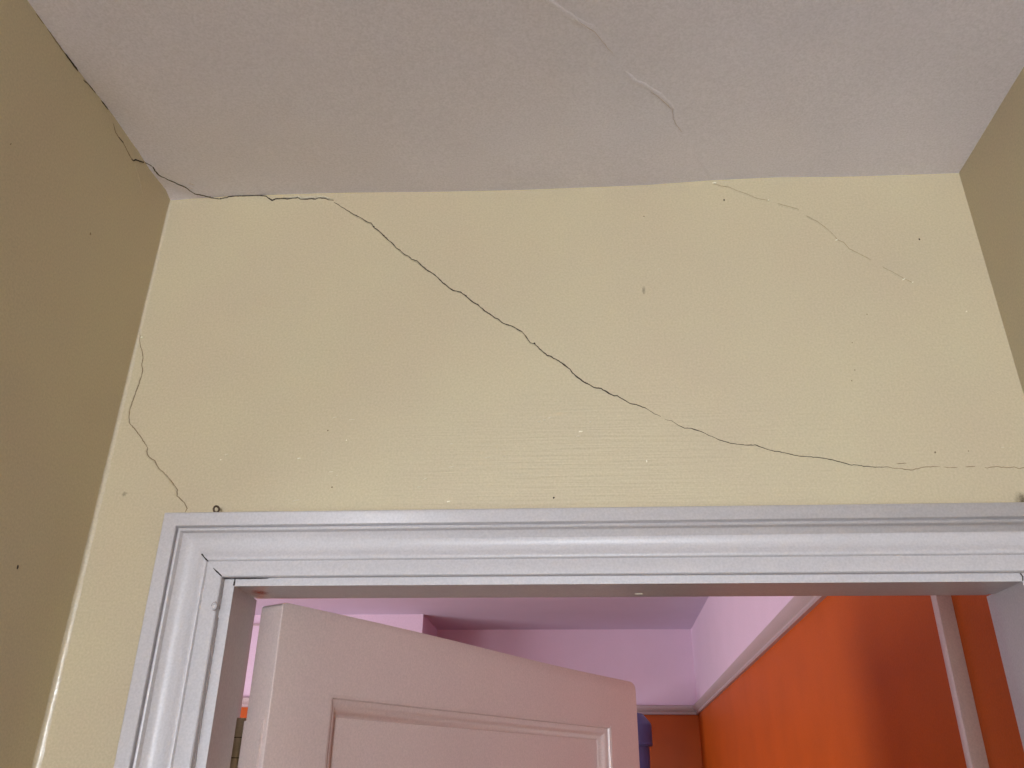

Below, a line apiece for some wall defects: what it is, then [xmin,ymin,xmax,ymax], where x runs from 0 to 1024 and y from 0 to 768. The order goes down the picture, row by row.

crack [127,336,187,512]
crack [36,14,1024,470]